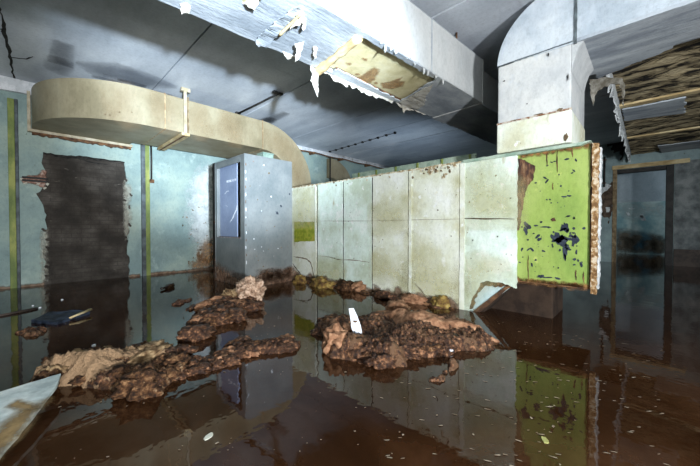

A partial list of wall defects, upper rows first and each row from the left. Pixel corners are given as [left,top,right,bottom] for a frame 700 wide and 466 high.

crack [0,8,33,79]
flaking render [20,170,49,189]
flaking render [122,179,133,238]
rust [517,143,590,230]
peeling [603,142,625,165]
rust [193,242,213,269]
peeling [519,215,586,280]
rust [517,255,589,290]